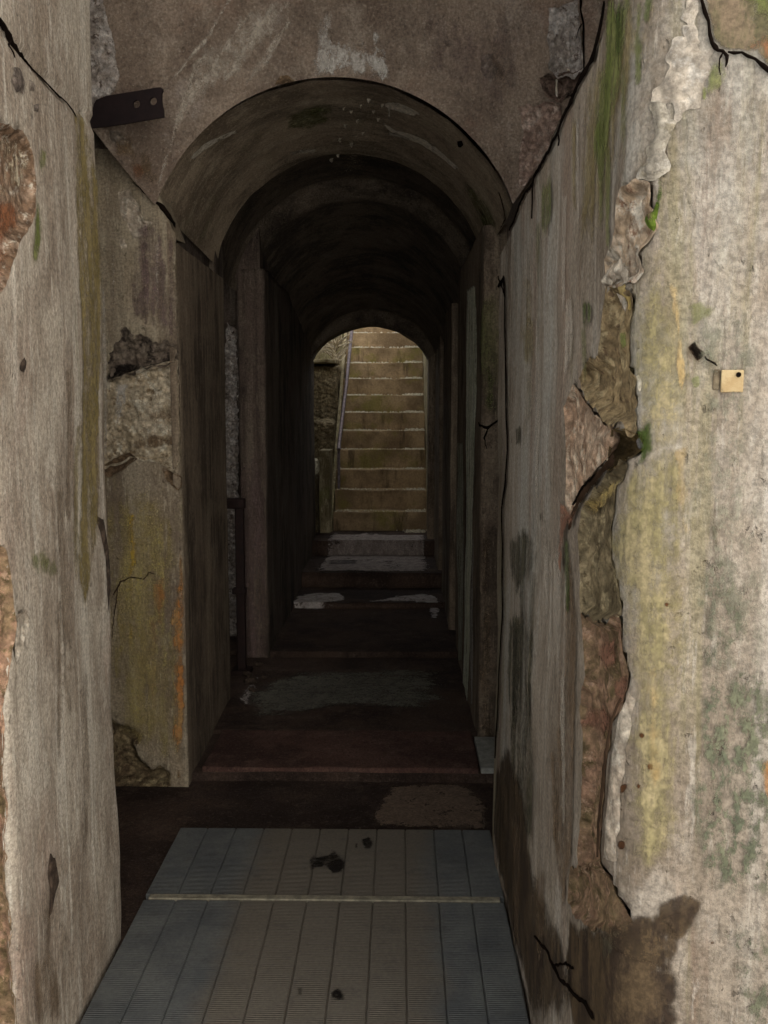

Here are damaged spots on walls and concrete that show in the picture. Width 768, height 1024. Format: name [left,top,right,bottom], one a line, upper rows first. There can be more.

crack [0,18,77,117]
crack [498,0,605,231]
crack [700,0,768,75]
spalling [0,123,37,292]
spalling [104,327,182,491]
spalling [558,0,714,950]
crack [112,572,154,636]
corrosion [171,585,185,746]
leakage [463,286,700,1024]
spalling [112,720,171,787]
crack [534,935,594,1019]